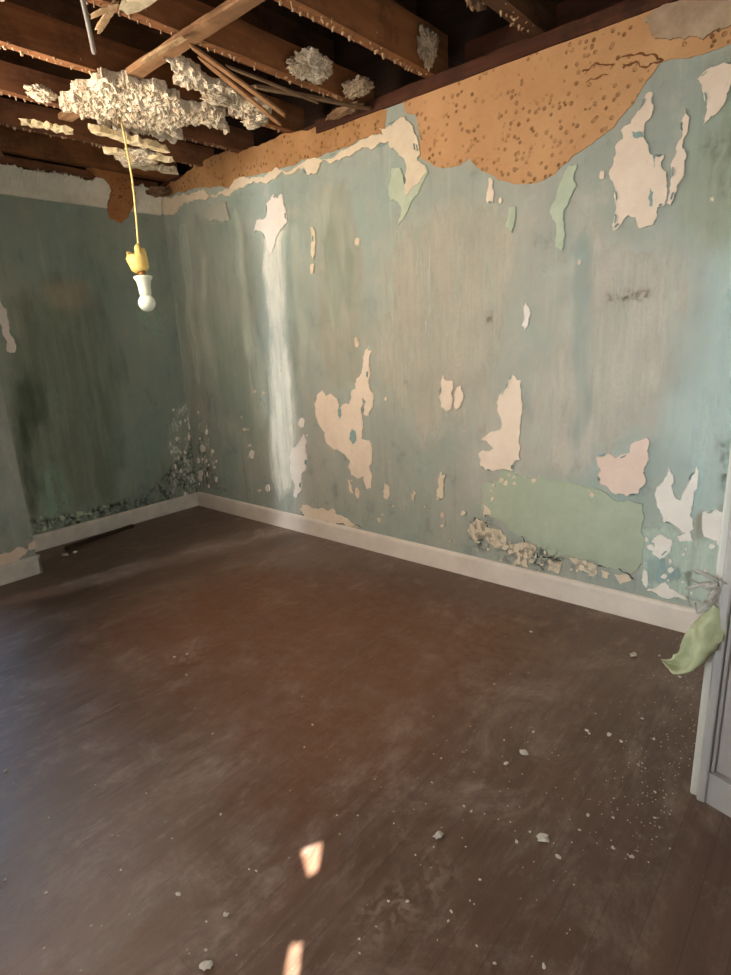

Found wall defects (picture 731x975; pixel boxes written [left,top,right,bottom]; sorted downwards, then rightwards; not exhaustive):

crack [582,52,664,83]
flaking render [161,0,731,256]
peeling [0,301,16,353]
peeling [0,506,111,567]
damp [158,404,216,501]
peeling [289,337,395,529]
peeling [410,472,446,508]
peeling [460,374,723,601]